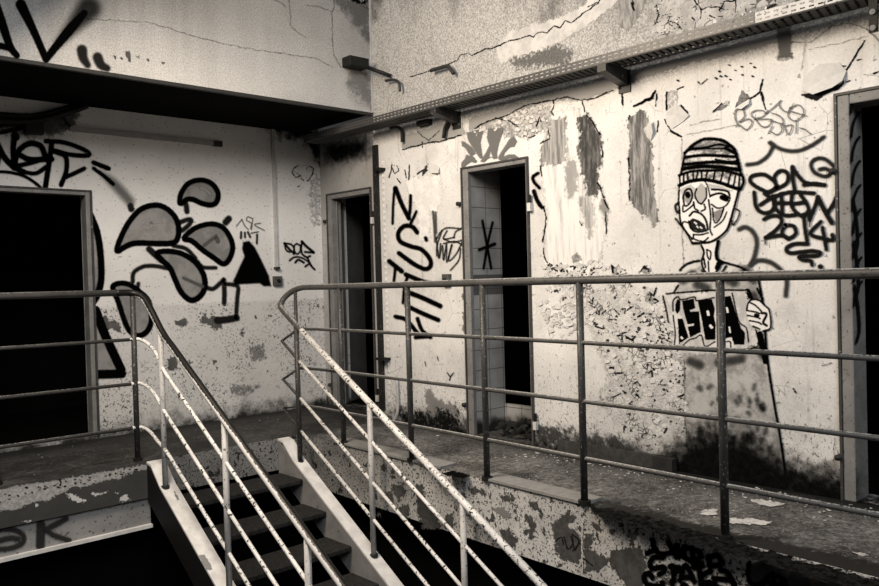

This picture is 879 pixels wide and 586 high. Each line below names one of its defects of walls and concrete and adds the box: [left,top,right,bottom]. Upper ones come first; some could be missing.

crack [410,0,600,77]
crack [654,0,746,28]
peeling [630,31,778,82]
peeling [647,0,799,40]
crack [792,23,879,74]
peeling [402,79,689,454]
peeling [0,464,147,512]
peeling [384,482,454,530]
spalling [443,470,487,499]